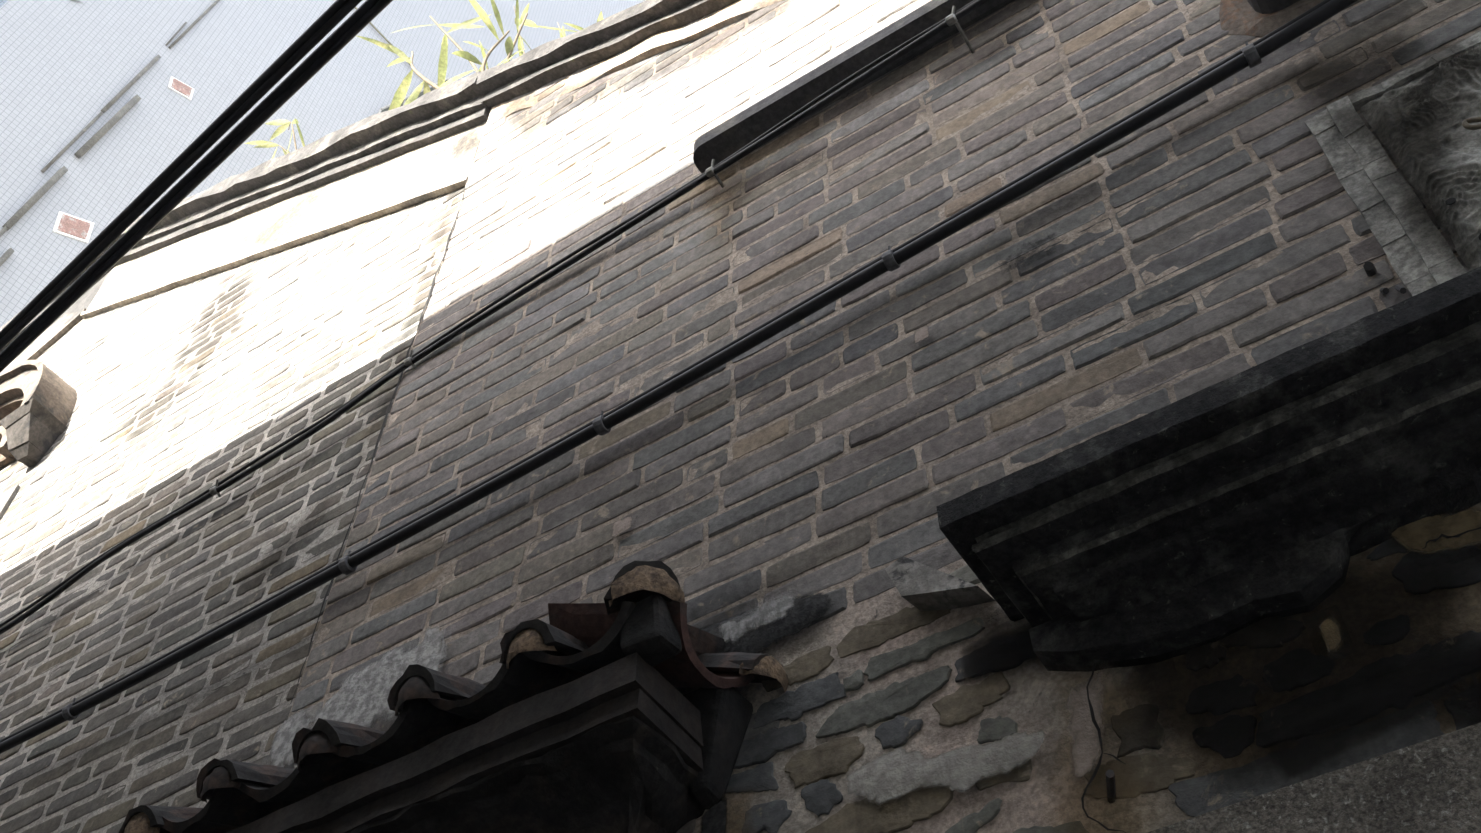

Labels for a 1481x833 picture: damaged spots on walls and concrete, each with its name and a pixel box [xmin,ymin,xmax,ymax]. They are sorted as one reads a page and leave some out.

leakage [964,624,1036,675]
leakage [1138,571,1481,772]